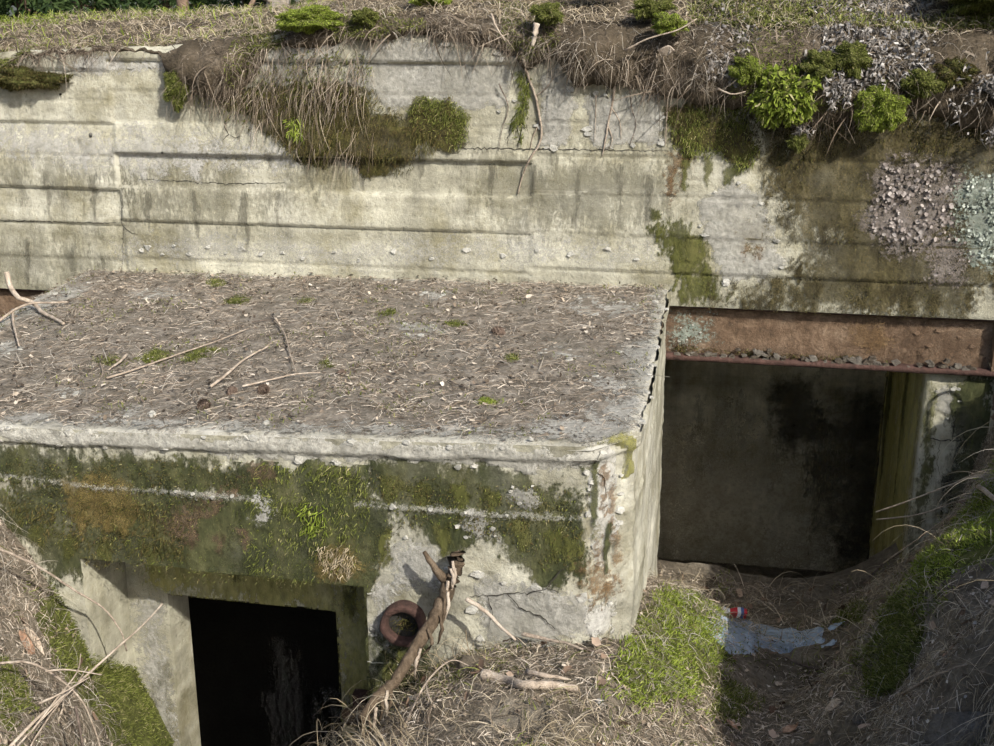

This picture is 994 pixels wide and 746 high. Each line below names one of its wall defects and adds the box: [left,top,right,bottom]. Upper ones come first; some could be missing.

water stain [0,116,302,186]
water stain [649,208,665,245]
water stain [669,105,994,319]
water stain [5,452,236,565]
water stain [251,493,278,522]
water stain [657,373,909,572]
crack [469,564,570,630]